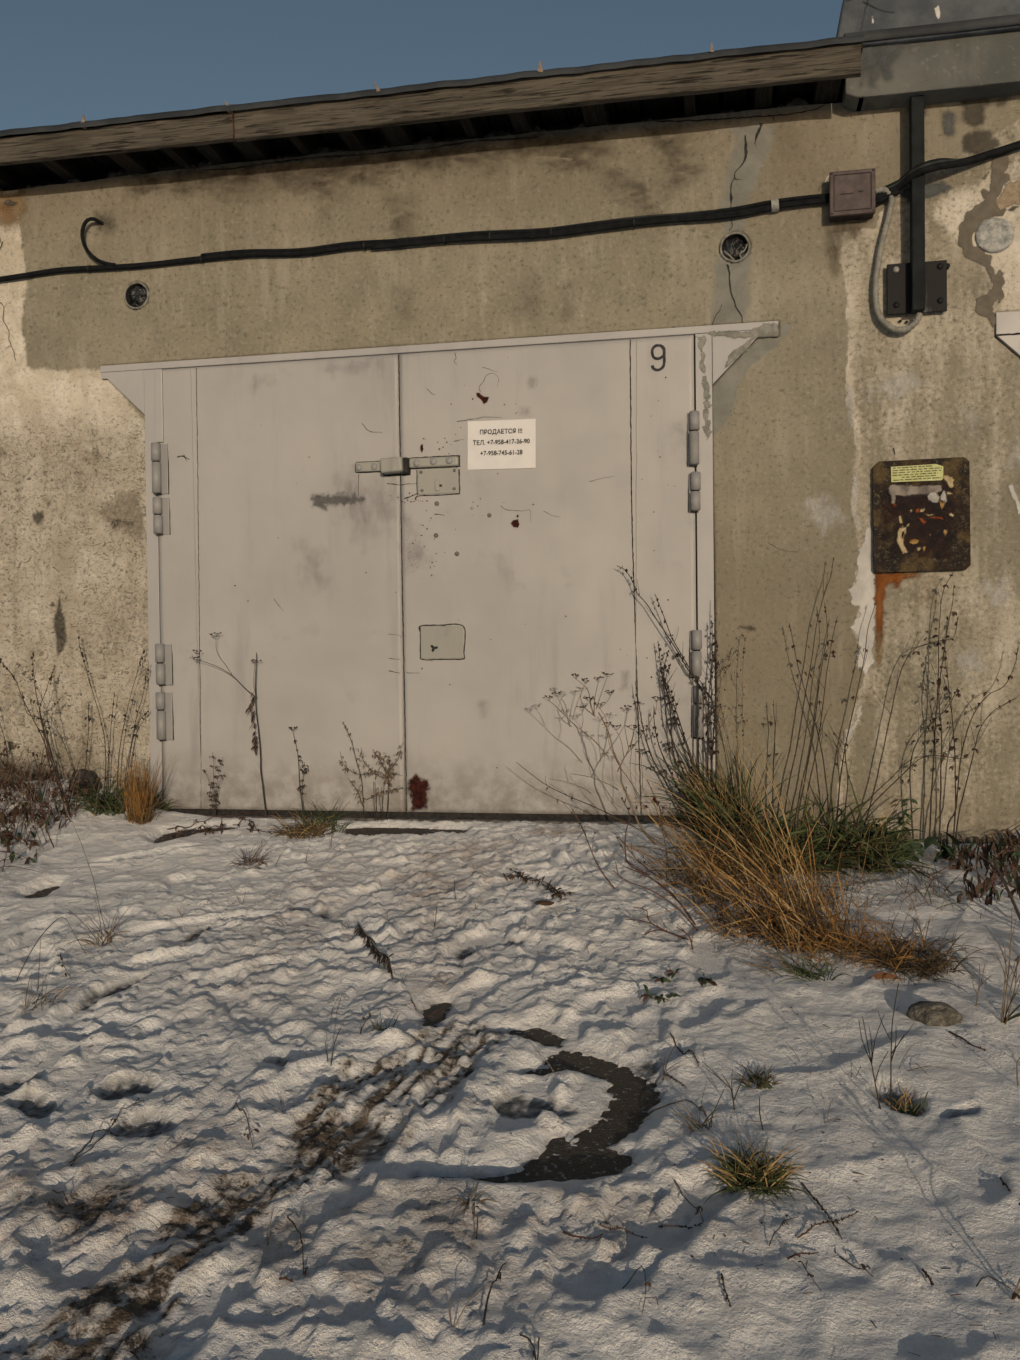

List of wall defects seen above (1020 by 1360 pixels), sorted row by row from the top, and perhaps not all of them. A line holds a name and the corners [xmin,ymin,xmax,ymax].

crack [656,105,825,231]
peeling [958,131,1020,327]
crack [712,264,743,325]
peeling [807,476,876,674]
rust [875,572,921,665]
peeling [845,700,864,743]
rust [408,775,430,811]